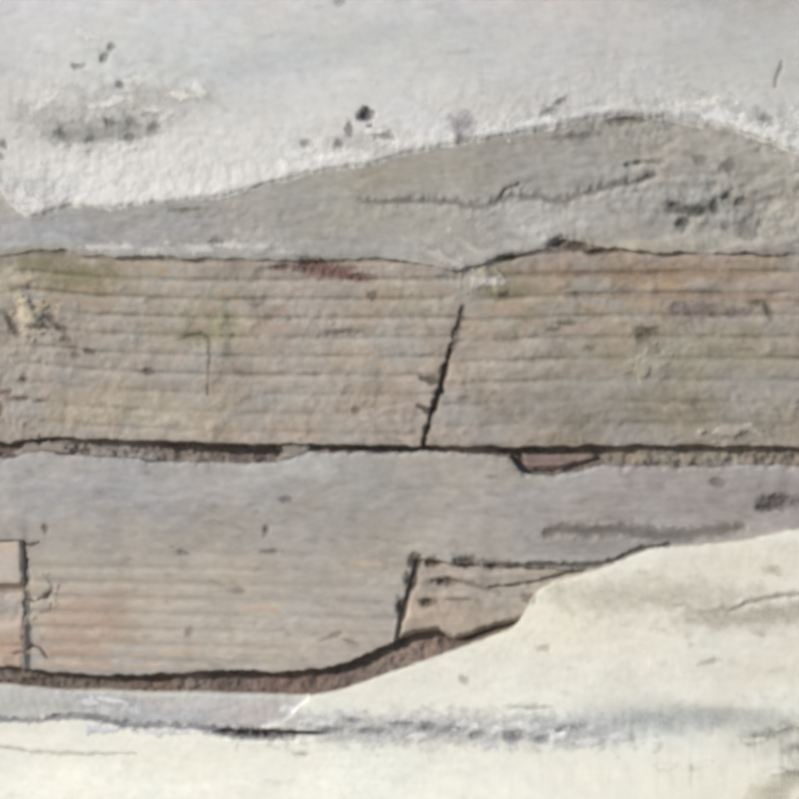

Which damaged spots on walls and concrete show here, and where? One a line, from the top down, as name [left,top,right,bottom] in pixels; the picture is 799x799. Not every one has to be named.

peeling [77,76,215,128]
spalling [0,96,799,675]
crack [419,305,464,447]
crack [399,554,420,619]
crack [483,542,670,568]
crack [15,589,52,658]
peeling [71,692,212,740]
peeling [273,705,645,752]